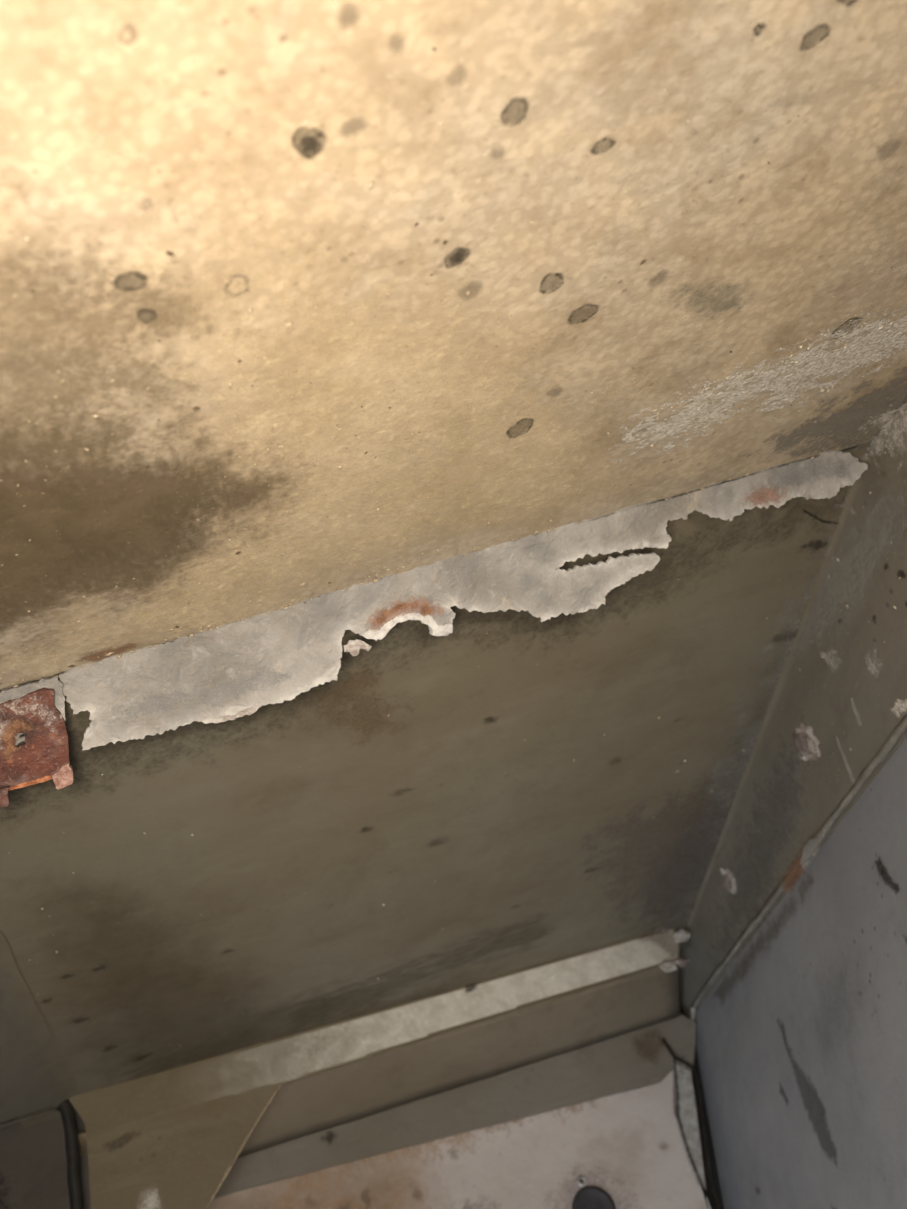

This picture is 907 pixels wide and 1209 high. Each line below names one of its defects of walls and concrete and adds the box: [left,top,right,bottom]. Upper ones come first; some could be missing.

leakage [292,127,324,158]
leakage [444,248,469,266]
leakage [0,253,591,632]
rust [0,450,868,759]